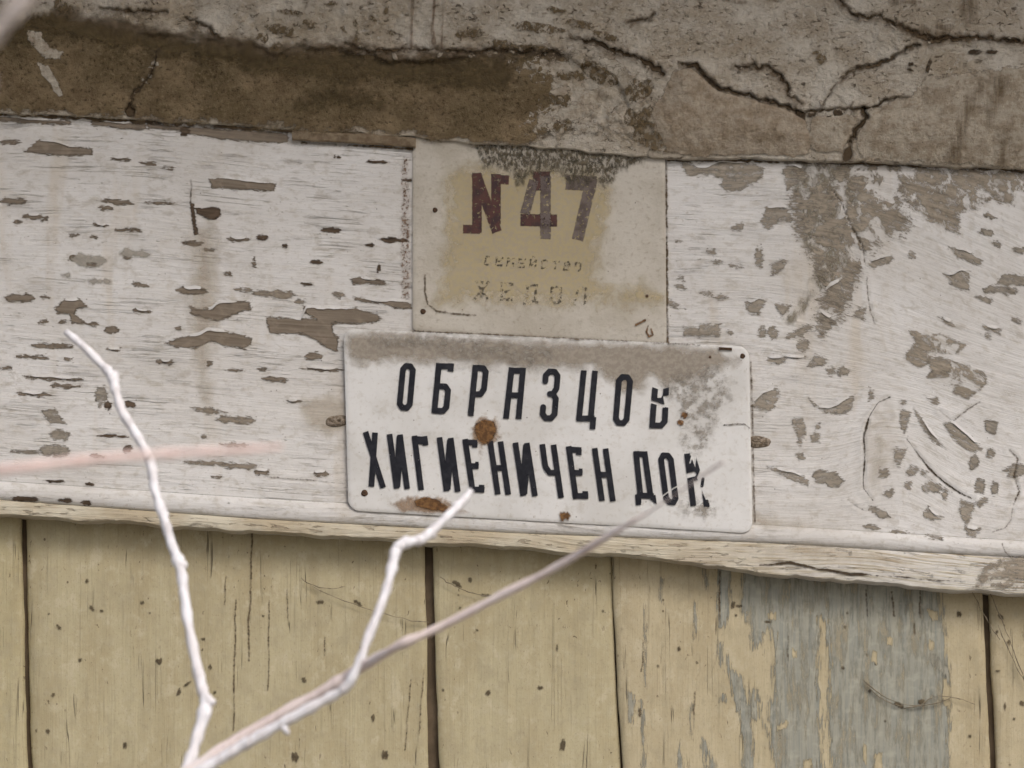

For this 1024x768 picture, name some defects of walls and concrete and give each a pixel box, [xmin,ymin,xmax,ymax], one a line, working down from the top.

crack [0,52,292,133]
crack [344,0,1024,168]
crack [973,167,1024,175]
peeling [5,292,121,352]
peeling [156,265,412,372]
peeling [745,161,1024,377]
rust [396,497,452,512]
rust [473,417,500,445]
crack [862,397,890,510]
crack [907,439,972,499]
peeling [898,400,1024,538]
peeling [702,568,952,768]